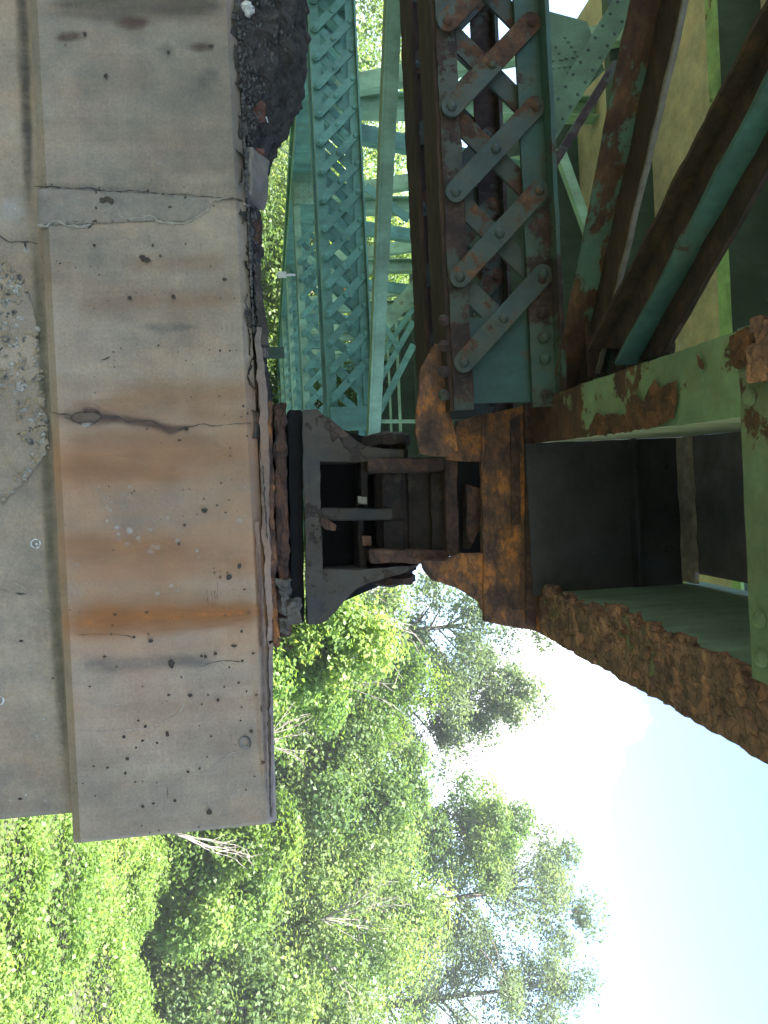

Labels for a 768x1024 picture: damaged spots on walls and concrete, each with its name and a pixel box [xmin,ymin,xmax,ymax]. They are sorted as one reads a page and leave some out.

crack [33,186,220,198]
spalling [0,260,51,503]
crack [18,410,250,434]
corrosion [589,380,677,437]